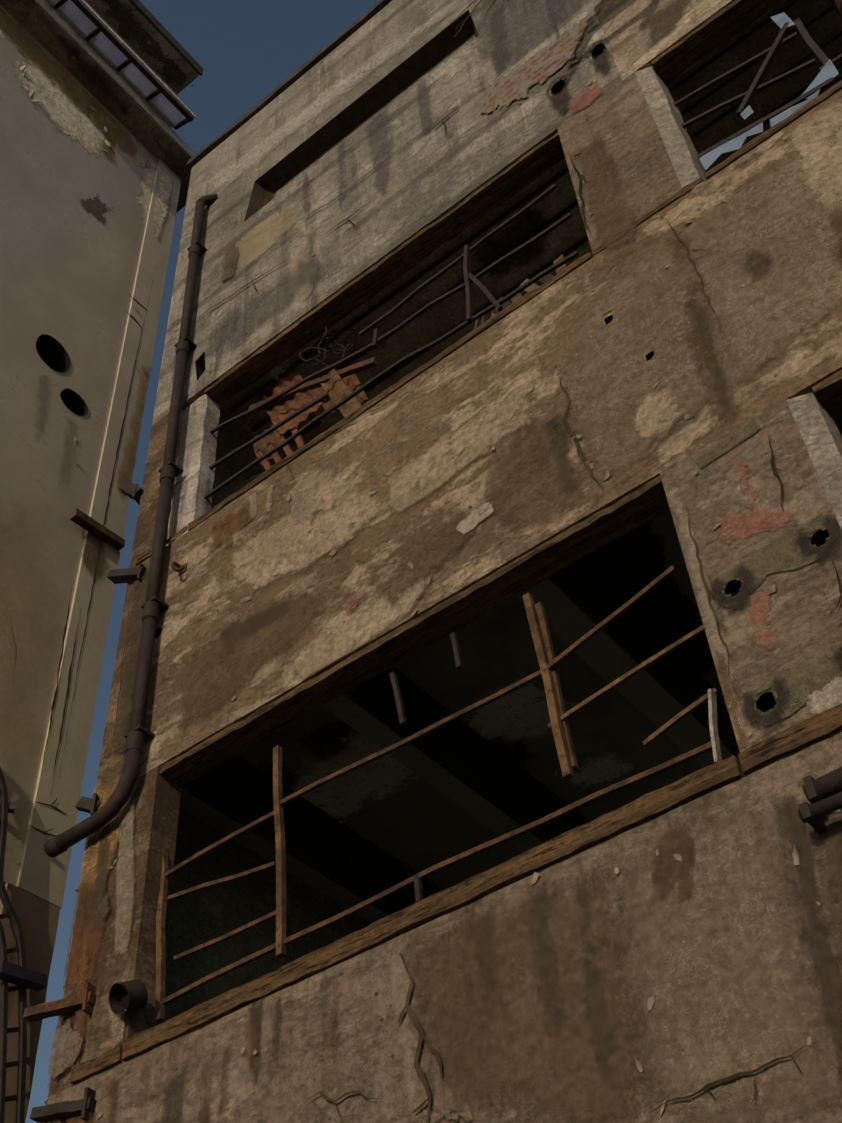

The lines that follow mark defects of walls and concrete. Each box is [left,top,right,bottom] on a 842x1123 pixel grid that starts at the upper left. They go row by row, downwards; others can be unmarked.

peeling [12,56,111,157]
spalling [101,0,194,87]
peeling [135,129,173,240]
crack [103,281,153,526]
crack [768,435,783,510]
crack [832,561,842,610]
crack [30,573,96,836]
corrosion [57,878,103,1035]
crack [398,952,442,1123]
damp [393,870,650,1121]
crack [649,1042,817,1114]
damp [776,801,842,1080]